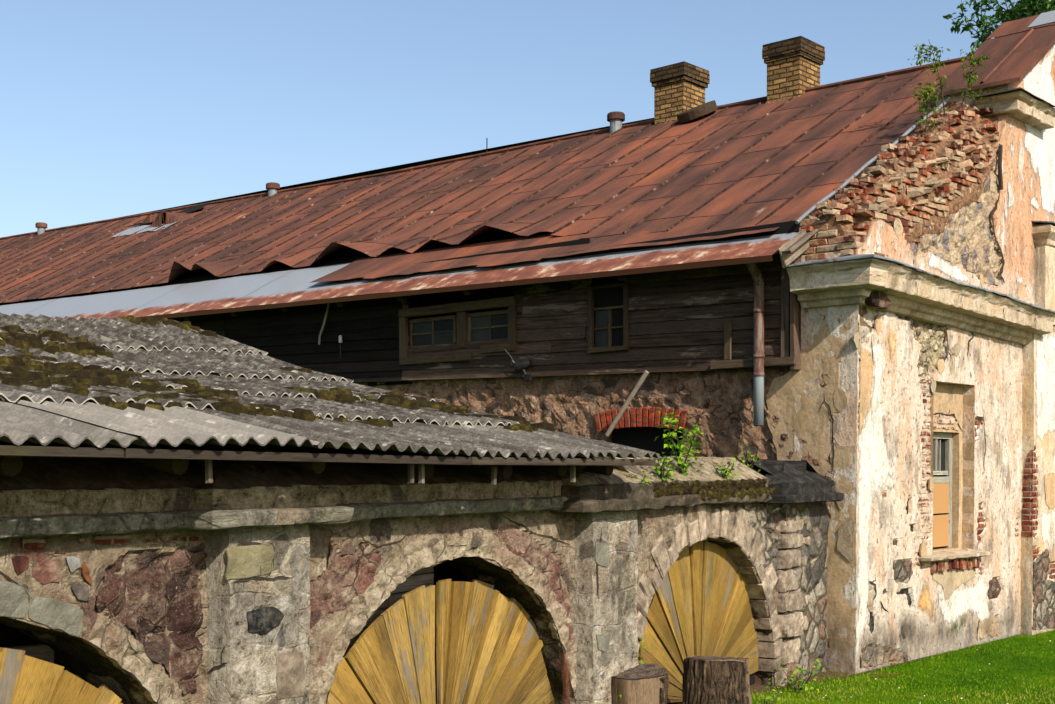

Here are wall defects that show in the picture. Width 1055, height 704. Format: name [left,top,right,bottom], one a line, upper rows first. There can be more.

spalling [811,114,1014,247]
peeling [929,254,984,287]
crack [819,394,838,472]
spalling [861,314,960,668]
spalling [977,503,986,545]
spalling [1015,444,1055,630]